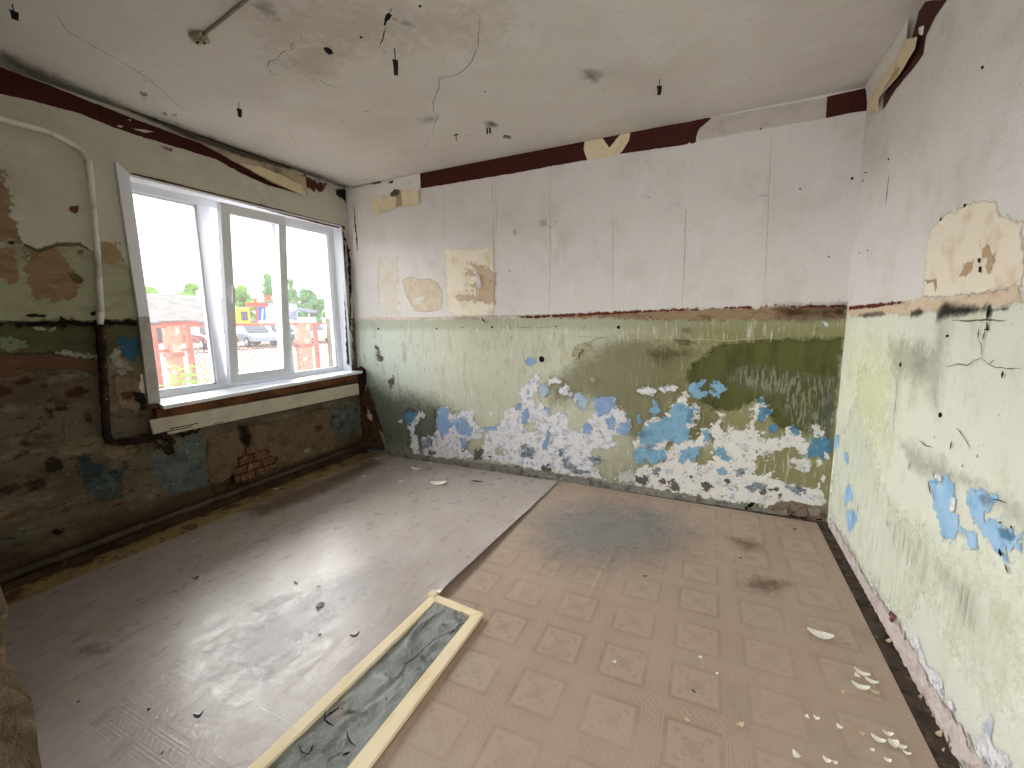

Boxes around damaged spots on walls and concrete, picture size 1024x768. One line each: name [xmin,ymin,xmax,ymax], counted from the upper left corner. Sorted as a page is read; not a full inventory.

crack [425,22,480,145]
peeling [0,164,122,304]
peeling [923,200,1024,297]
crack [945,340,1021,369]
peeling [75,210,1023,768]
water stain [687,337,1022,699]